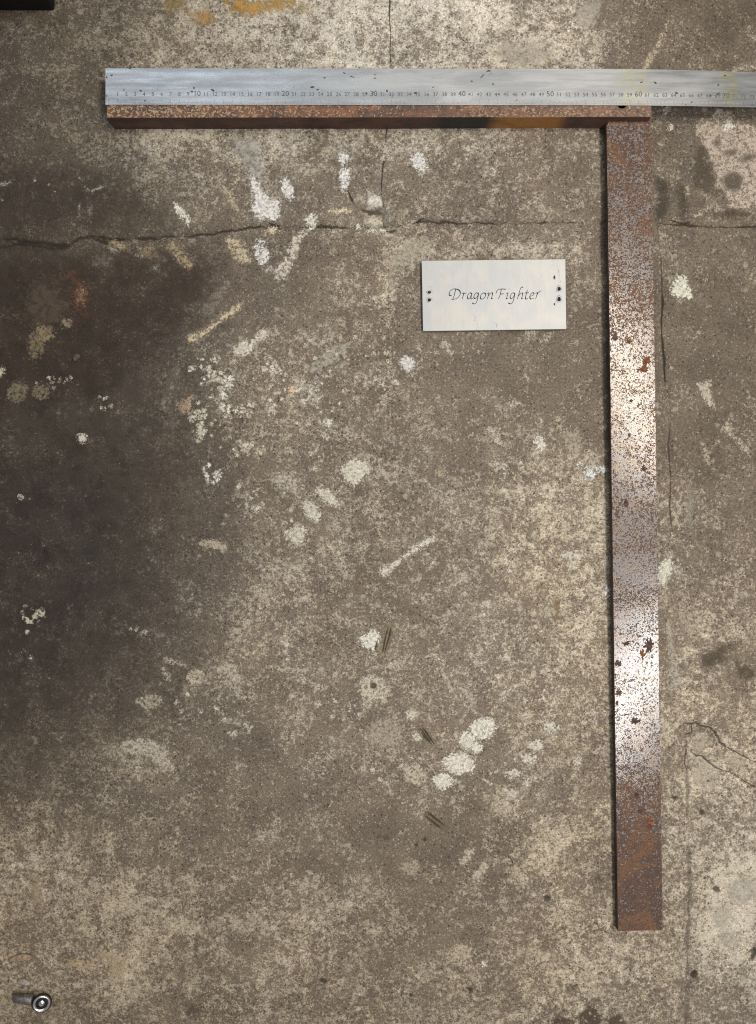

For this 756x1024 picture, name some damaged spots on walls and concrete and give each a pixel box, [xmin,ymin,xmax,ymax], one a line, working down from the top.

crack [386,0,394,66]
crack [4,190,496,250]
crack [664,220,756,228]
crack [660,253,669,394]
crack [666,433,674,526]
crack [683,722,756,788]